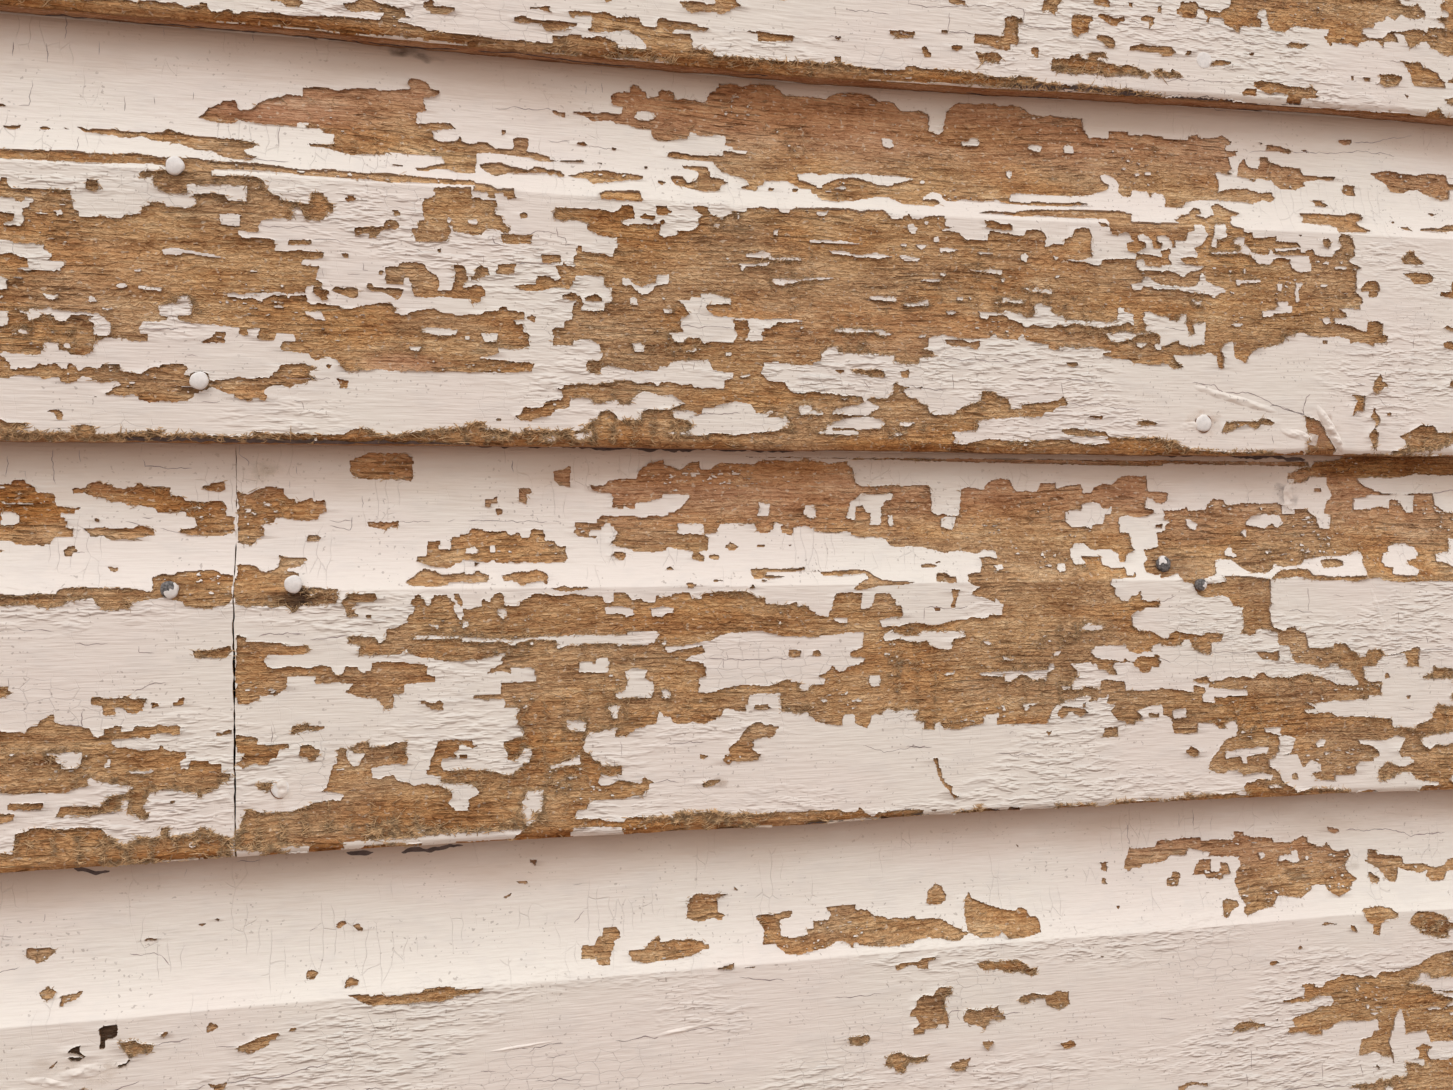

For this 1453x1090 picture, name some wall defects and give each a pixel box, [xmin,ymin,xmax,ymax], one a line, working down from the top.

peeling [0,0,1453,871]
peeling [1124,831,1453,918]
peeling [686,893,725,921]
peeling [27,947,56,963]
peeling [581,927,709,966]
peeling [756,884,1041,970]
peeling [977,960,1037,975]
peeling [351,987,481,1006]
peeling [910,987,1002,1034]
peeling [1020,991,1069,1007]
peeling [1286,906,1453,1090]
peeling [238,1033,280,1054]